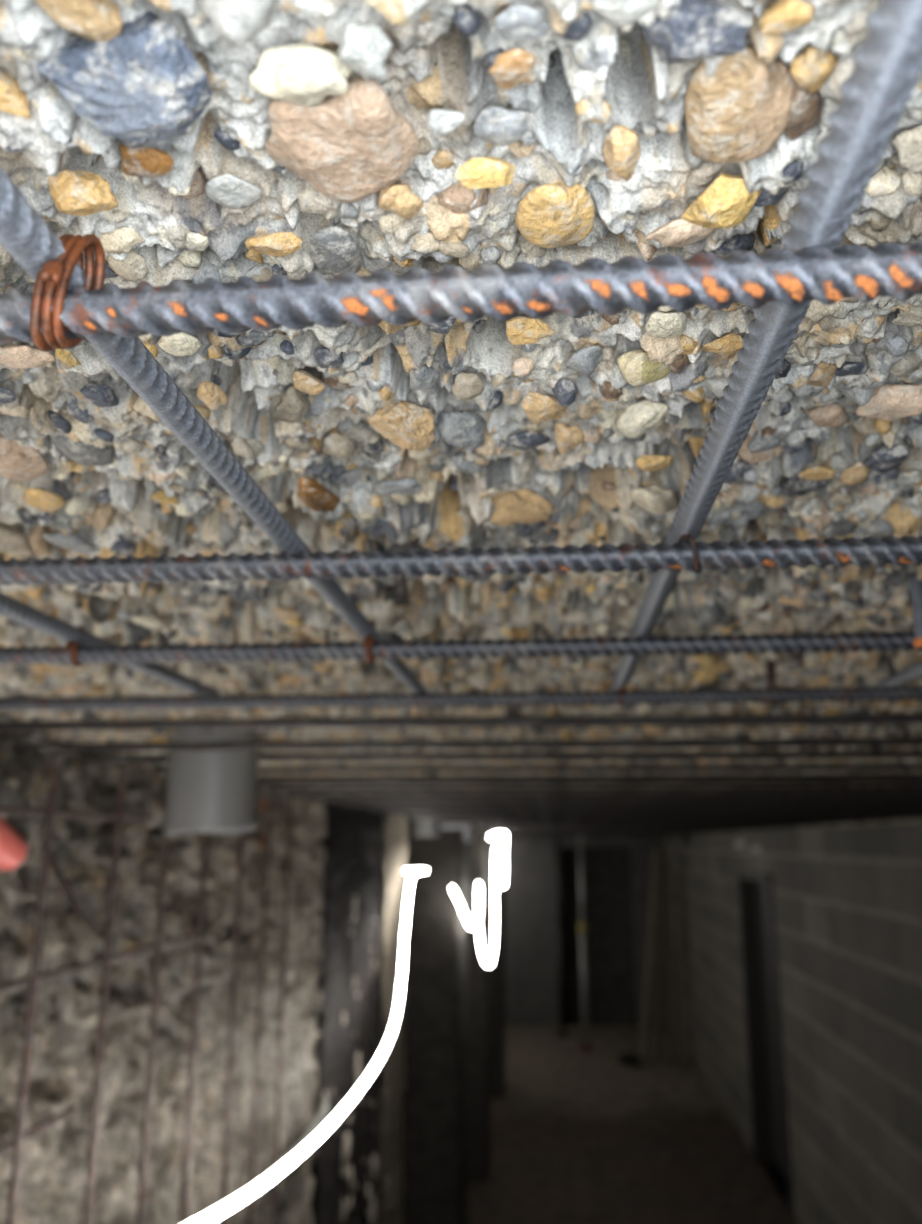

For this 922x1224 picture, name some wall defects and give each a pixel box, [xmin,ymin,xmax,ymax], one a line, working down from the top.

spalling [67,252,85,291]
rust [169,302,187,316]
rust [341,288,395,315]
rust [528,301,550,311]
rust [585,279,611,297]
rust [629,280,648,301]
rust [665,275,764,302]
rust [774,273,804,301]
rust [825,281,842,302]
rust [855,275,878,298]
rust [889,265,913,287]